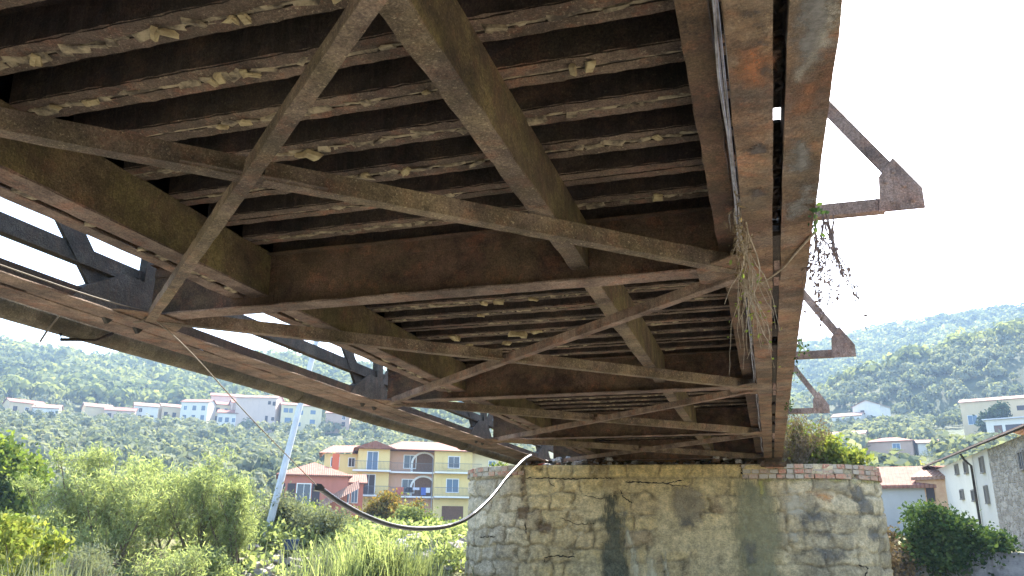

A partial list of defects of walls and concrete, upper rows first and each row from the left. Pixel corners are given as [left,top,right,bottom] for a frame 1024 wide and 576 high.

crack [527,477,688,525]